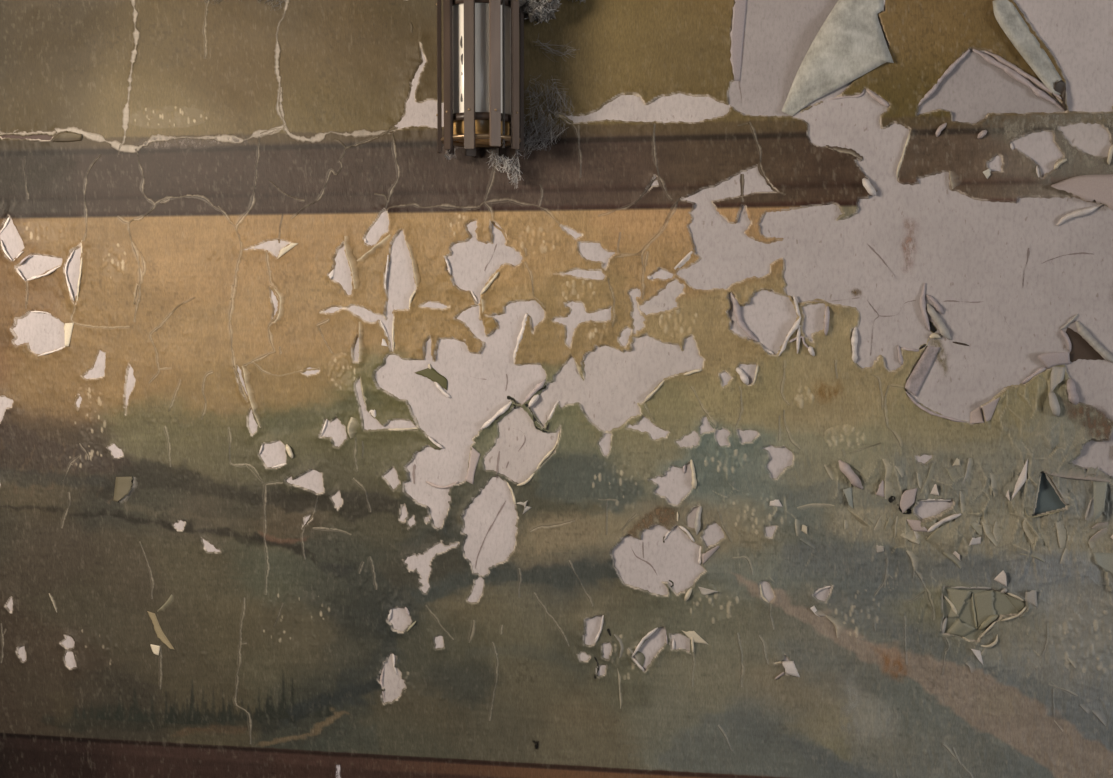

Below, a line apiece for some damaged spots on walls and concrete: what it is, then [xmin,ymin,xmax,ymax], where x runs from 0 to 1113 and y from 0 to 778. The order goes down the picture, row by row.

peeling [0,216,82,301]
peeling [0,397,13,422]
peeling [13,311,74,356]
crack [0,0,560,744]
peeling [321,0,1113,603]
peeling [388,607,416,631]
crack [517,568,569,647]
peeling [810,586,848,638]
peeling [941,570,1038,673]
peeling [379,653,406,703]
peeling [579,615,709,709]